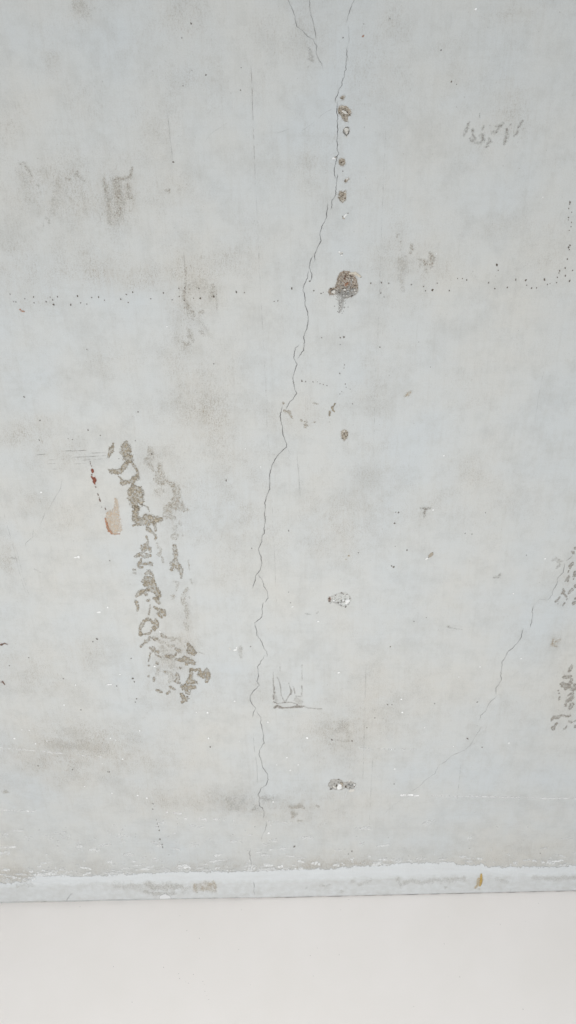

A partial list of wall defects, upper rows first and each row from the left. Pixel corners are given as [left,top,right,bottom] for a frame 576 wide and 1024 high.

spalling [320,271,389,313]
peeling [108,441,211,704]
peeling [551,670,576,730]